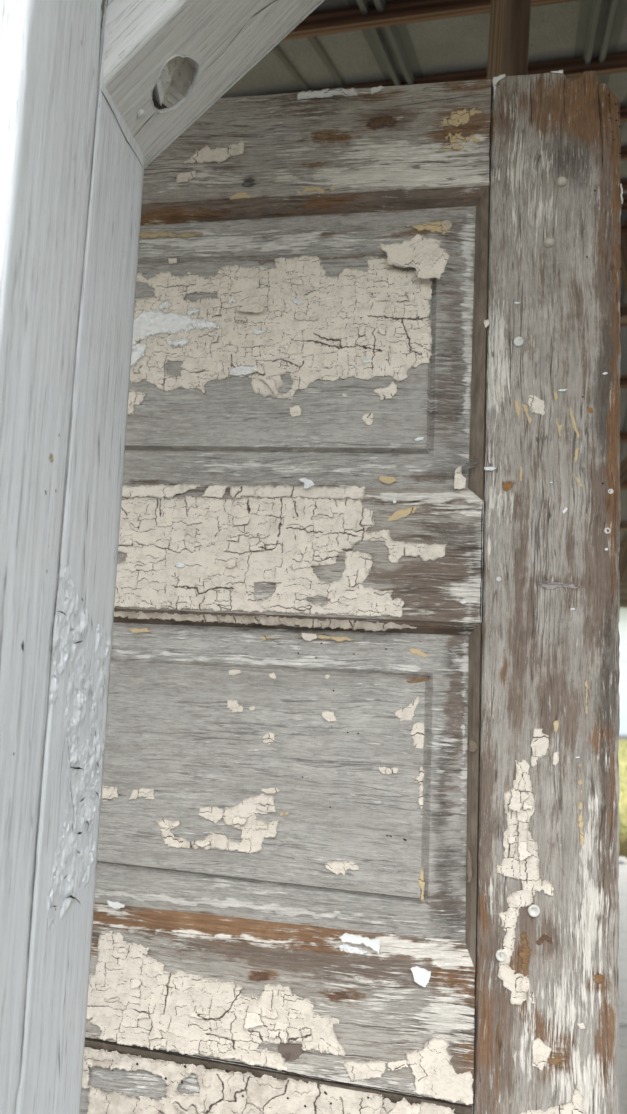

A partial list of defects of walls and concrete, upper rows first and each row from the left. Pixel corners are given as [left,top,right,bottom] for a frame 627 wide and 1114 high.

crack [406,86,492,181]
peeling [127,220,450,417]
peeling [362,412,373,425]
peeling [114,483,447,642]
crack [477,505,485,621]
peeling [156,787,289,854]
peeling [497,721,559,1005]
peeling [82,931,474,1114]
crack [85,972,476,1103]